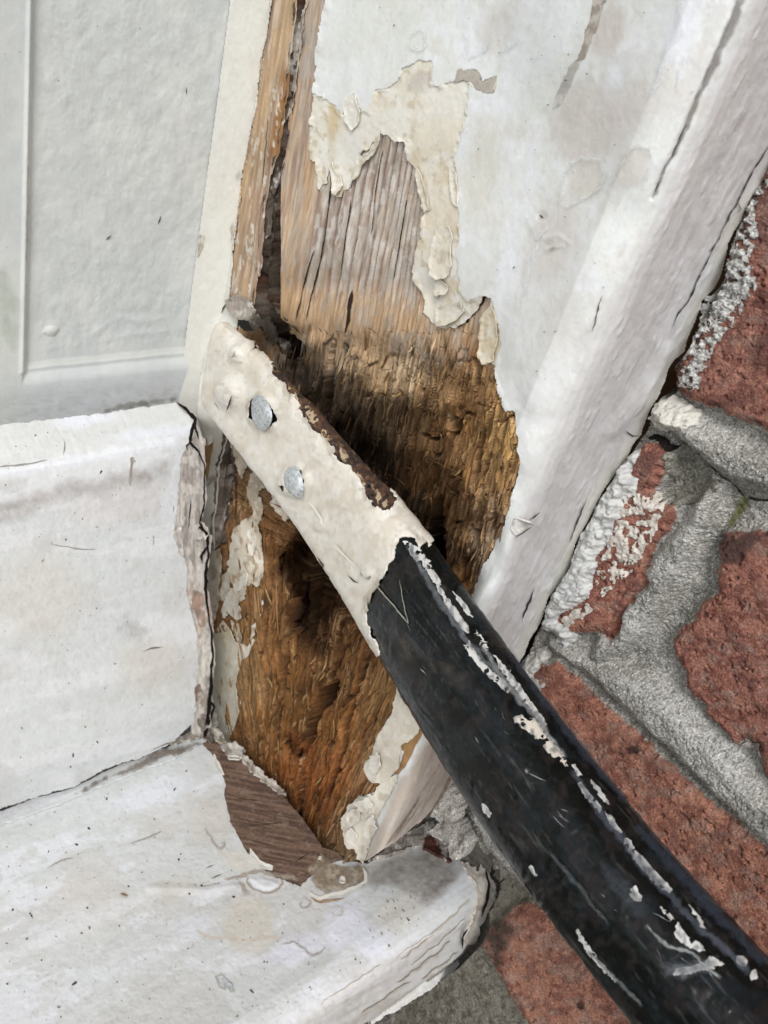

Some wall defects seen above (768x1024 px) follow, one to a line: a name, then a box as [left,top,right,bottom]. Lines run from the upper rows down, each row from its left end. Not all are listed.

crack [252,0,348,365]
peeling [229,0,501,366]
crack [654,0,743,195]
crack [674,148,768,324]
crack [153,402,246,760]
peeling [173,435,326,878]
peeling [341,690,422,863]
peeling [390,764,451,843]